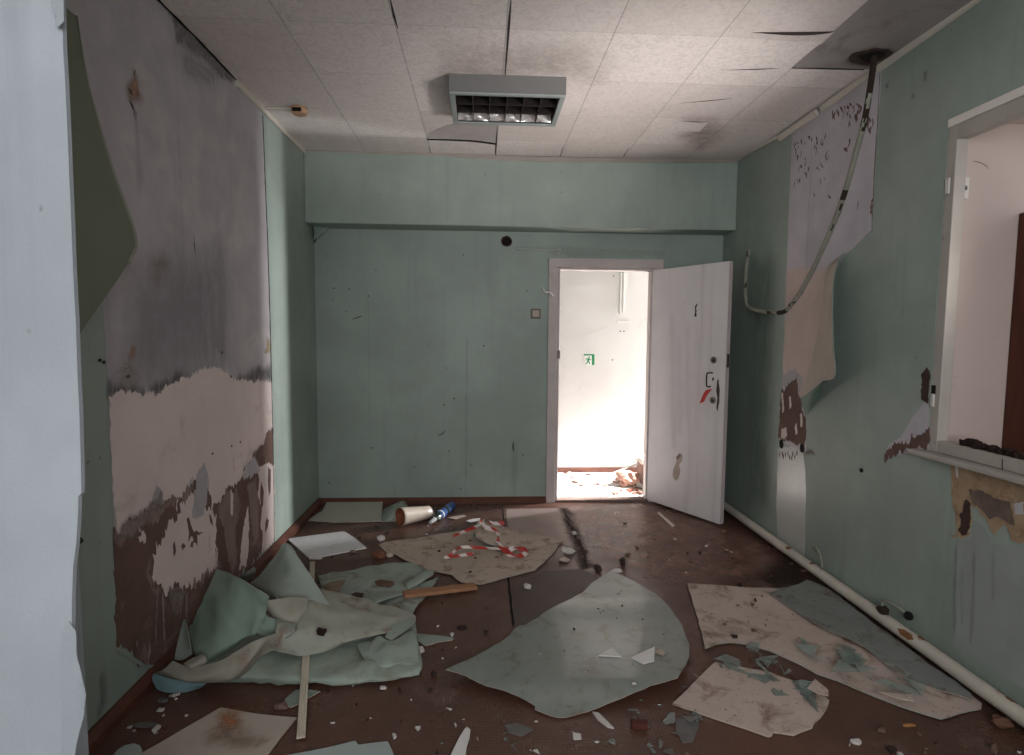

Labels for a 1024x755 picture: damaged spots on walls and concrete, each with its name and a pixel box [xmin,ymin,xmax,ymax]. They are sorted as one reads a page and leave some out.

flaking render [848,48,893,66]
peeling [832,103,874,152]
crack [427,132,497,155]
damp [244,368,270,381]
peeling [779,439,805,459]
flaking render [950,465,1024,544]